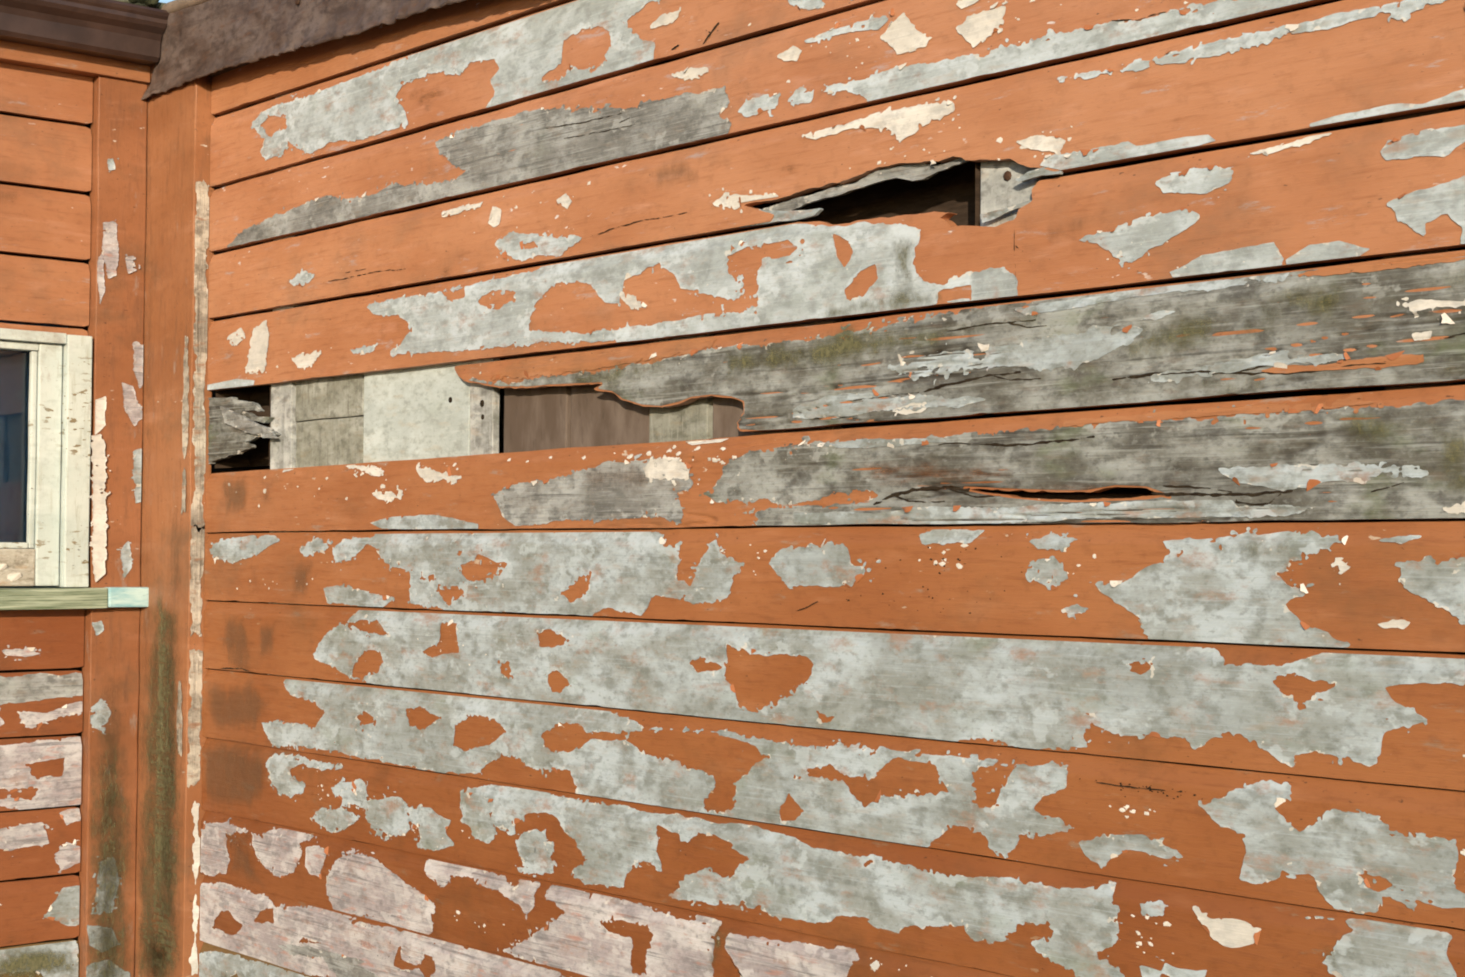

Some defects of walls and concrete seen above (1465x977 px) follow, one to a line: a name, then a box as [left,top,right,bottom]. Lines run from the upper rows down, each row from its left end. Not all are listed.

peeling [97,220,140,303]
peeling [227,0,1465,419]
peeling [92,621,104,635]
peeling [88,341,143,582]
peeling [176,176,1465,977]
crack [873,485,994,505]
crack [938,436,1095,447]
peeling [0,645,130,977]